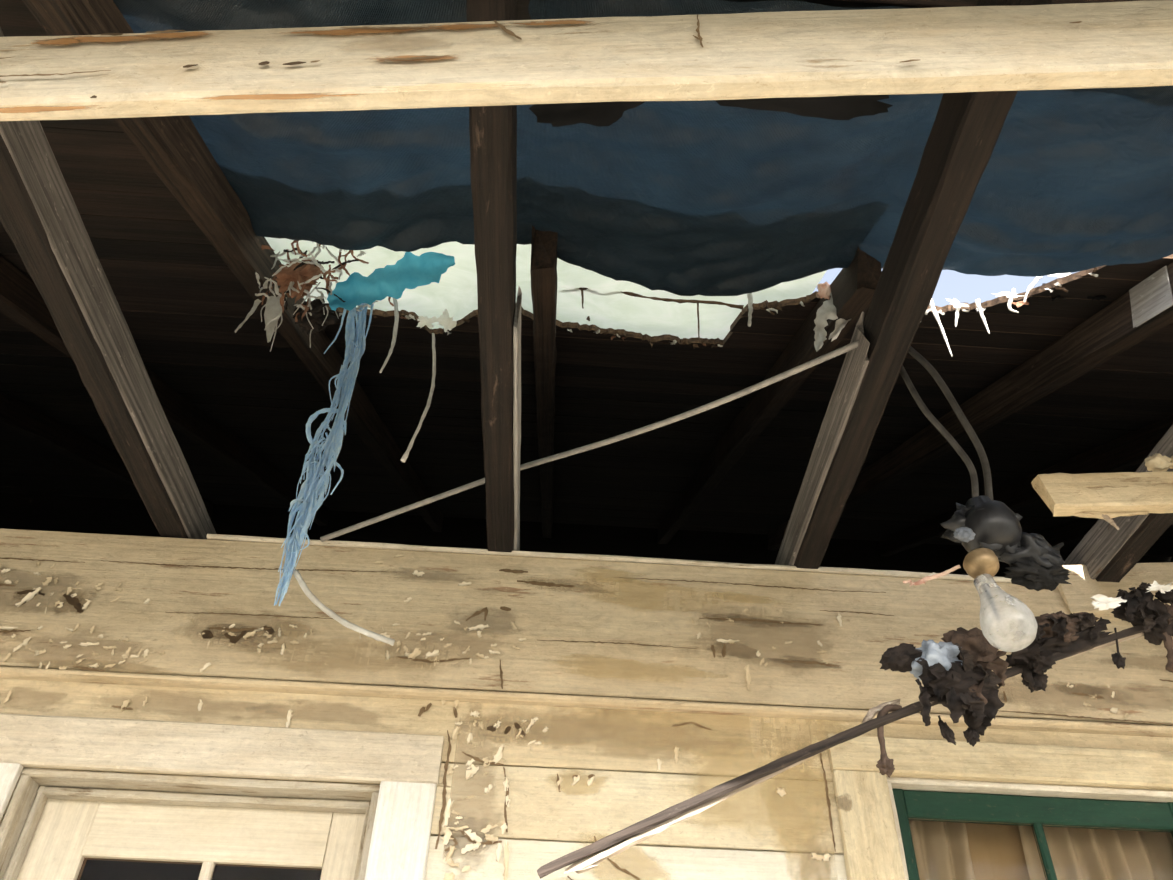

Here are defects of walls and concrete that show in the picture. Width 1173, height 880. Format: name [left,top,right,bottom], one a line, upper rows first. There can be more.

peeling [0,561,166,672]
peeling [222,624,307,655]
peeling [379,606,527,689]
peeling [112,696,148,712]
peeling [418,699,549,880]